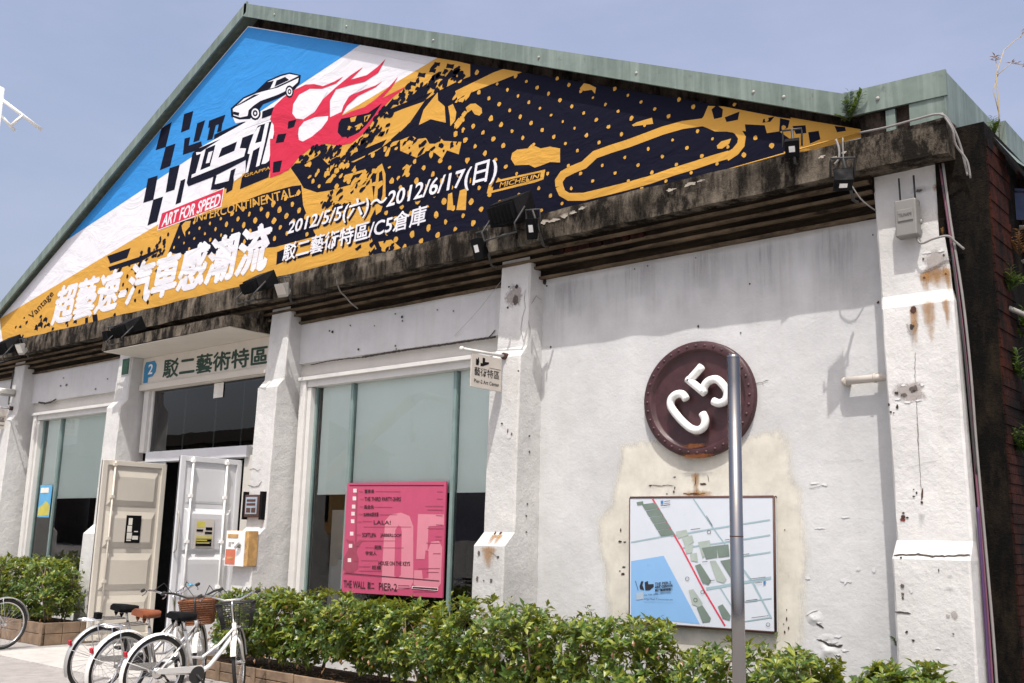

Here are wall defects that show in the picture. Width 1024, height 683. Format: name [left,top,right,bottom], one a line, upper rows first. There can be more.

peeling [541,206,585,225]
spalling [506,284,521,309]
corrosion [910,300,948,333]
spalling [888,382,925,414]
corrosion [685,444,711,458]
corrosion [648,474,709,496]
corrosion [485,532,502,561]
peeling [600,441,732,658]
peeling [742,432,828,660]